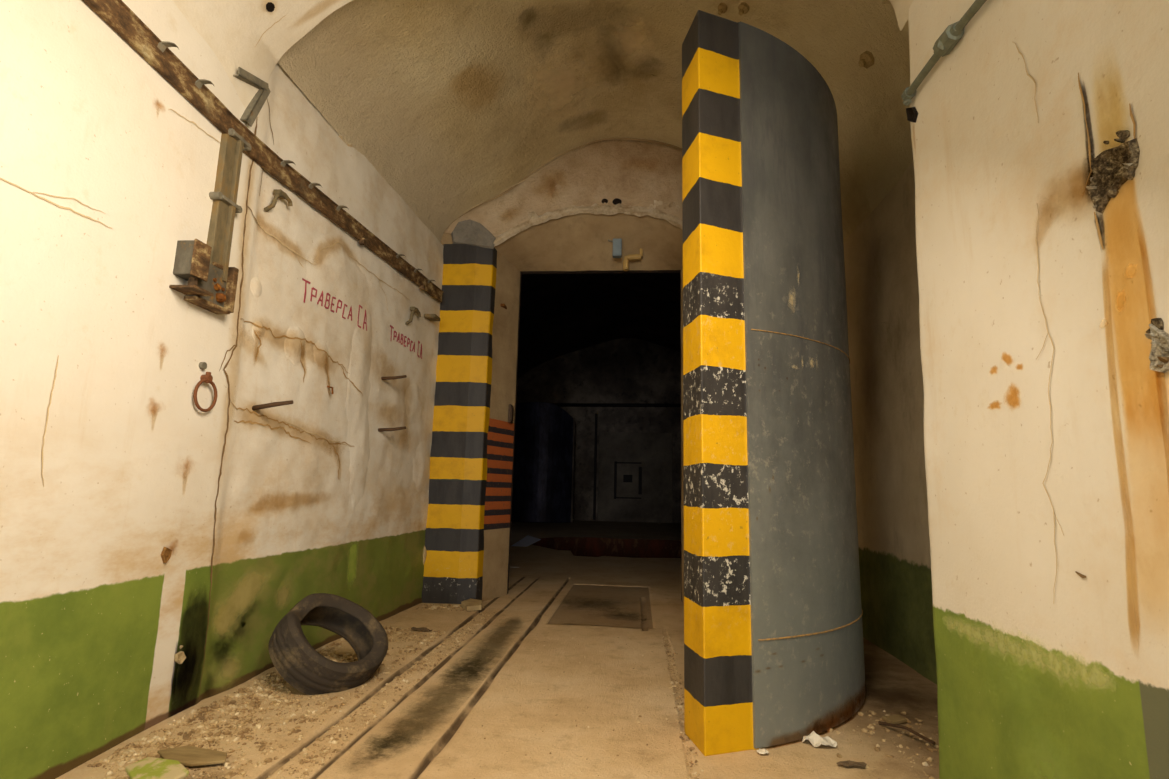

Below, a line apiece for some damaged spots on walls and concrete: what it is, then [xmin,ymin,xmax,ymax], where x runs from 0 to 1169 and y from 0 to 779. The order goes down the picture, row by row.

corrosion [1082,86,1094,177]
spalling [1078,73,1140,250]
crack [0,178,113,229]
water stain [244,321,363,395]
spalling [1144,318,1169,373]
water stain [232,403,352,479]
crack [199,100,408,698]
crack [1035,204,1086,604]
water stain [172,652,195,687]